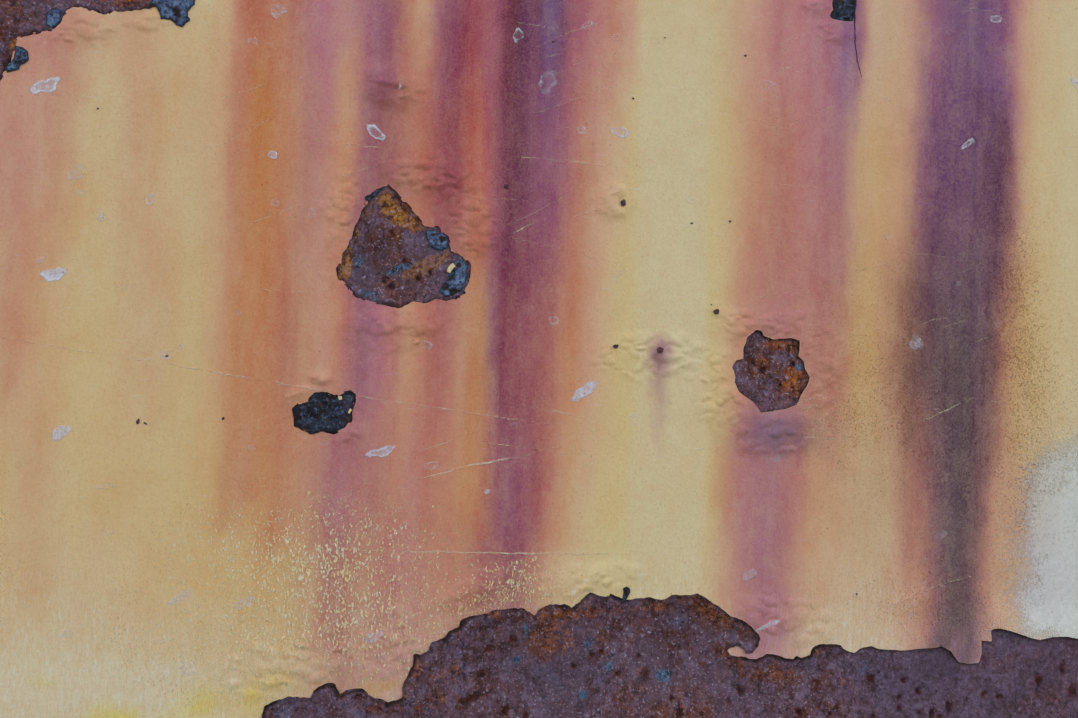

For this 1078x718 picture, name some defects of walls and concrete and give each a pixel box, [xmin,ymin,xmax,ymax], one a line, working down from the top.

peeling [0,0,195,80]
peeling [830,0,855,21]
corrosion [501,0,533,367]
peeling [336,184,471,308]
peeling [292,390,356,434]
peeling [732,330,809,413]
corrosion [913,98,1010,645]
peeling [119,491,1078,718]